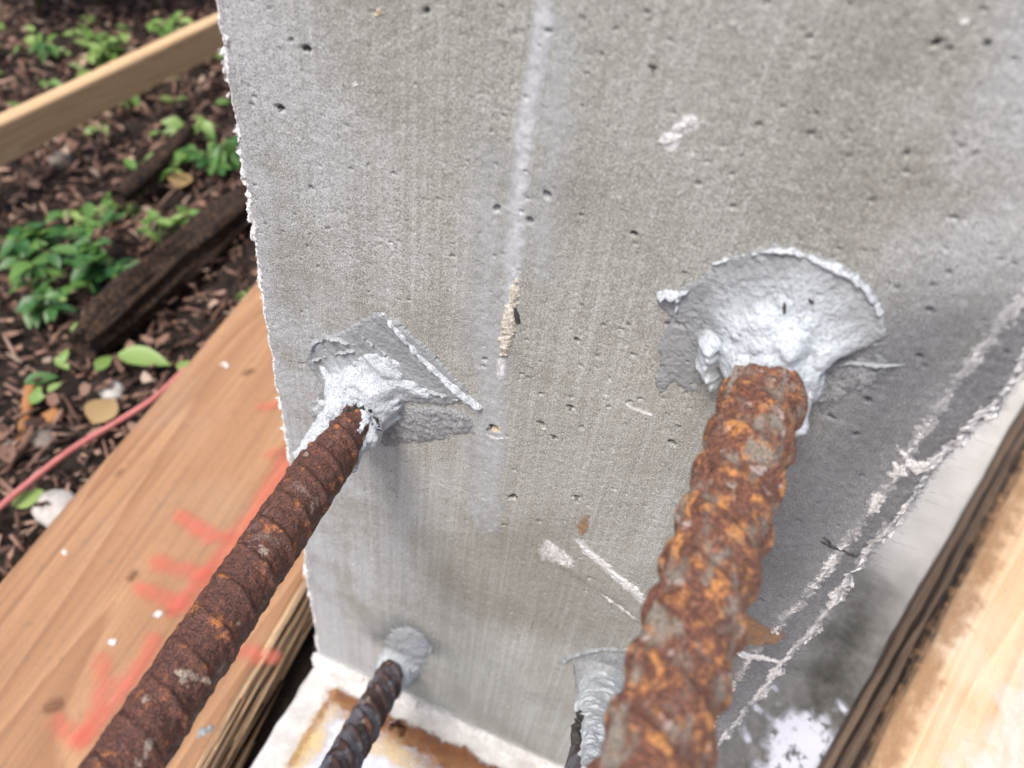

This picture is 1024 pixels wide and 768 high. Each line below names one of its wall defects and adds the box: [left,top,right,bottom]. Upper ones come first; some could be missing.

spalling [78,0,582,768]
spalling [577,347,1024,768]
crack [821,537,860,558]
corrosion [288,689,359,768]
corrosion [371,714,498,768]